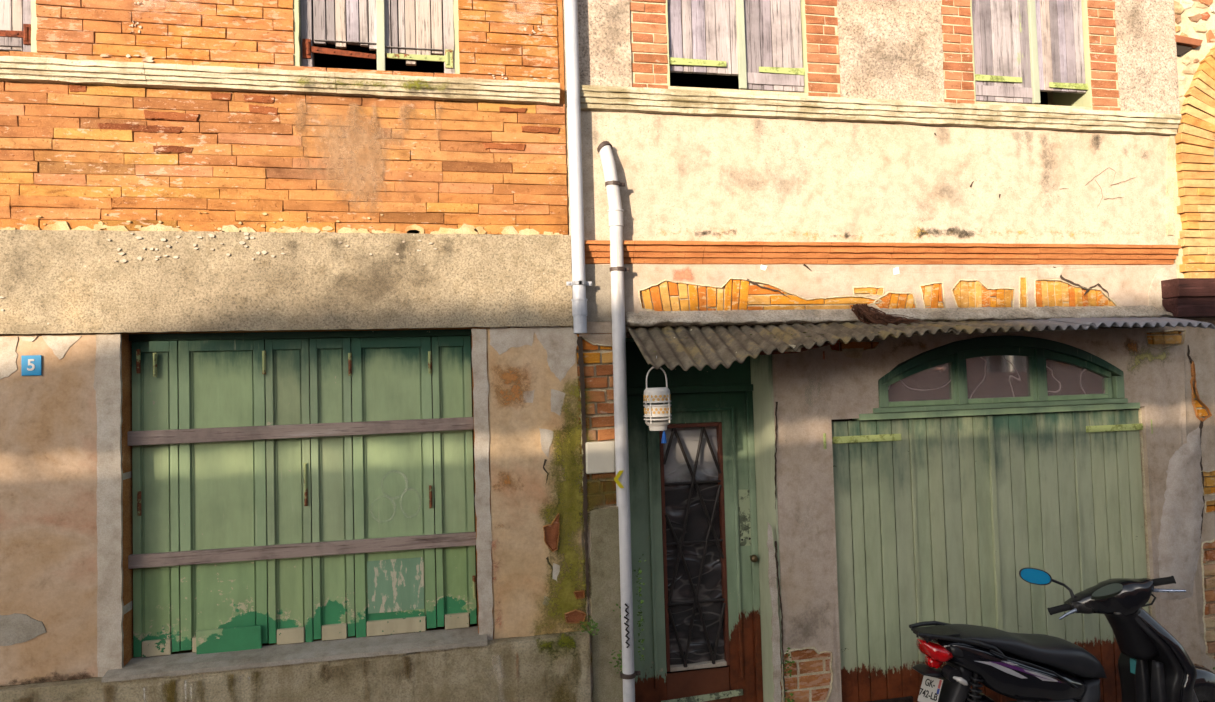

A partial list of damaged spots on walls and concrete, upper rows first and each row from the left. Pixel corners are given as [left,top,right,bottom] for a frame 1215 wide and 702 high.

spalling [638,265,1117,311]
peeling [0,335,81,379]
peeling [489,326,615,458]
spalling [1190,361,1212,422]
flaking render [581,466,618,513]
spalling [1201,469,1215,514]
spalling [543,513,560,581]
spalling [766,522,834,702]
spalling [1201,538,1215,661]
leakage [165,680,203,702]